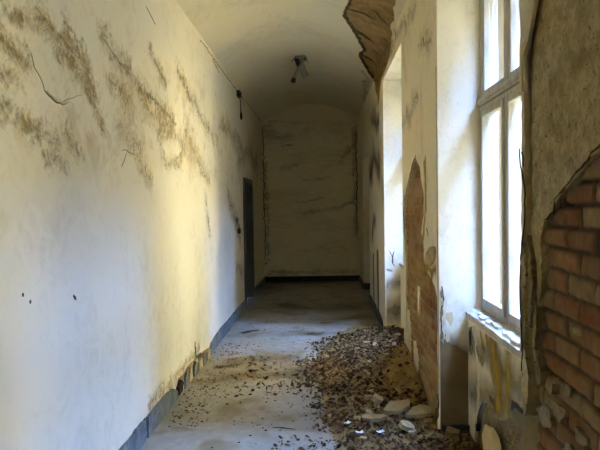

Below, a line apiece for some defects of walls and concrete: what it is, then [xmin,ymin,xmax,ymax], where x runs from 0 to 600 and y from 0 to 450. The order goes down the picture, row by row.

crack [31,53,80,105]
water stain [36,17,96,104]
spalling [342,0,374,78]
water stain [135,81,210,184]
flaking render [475,0,600,450]
flaking render [405,161,453,429]